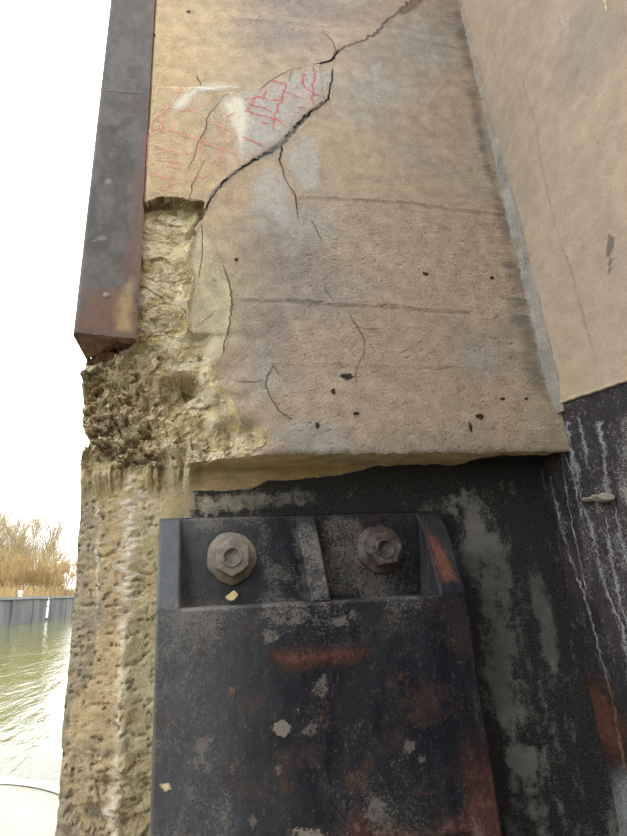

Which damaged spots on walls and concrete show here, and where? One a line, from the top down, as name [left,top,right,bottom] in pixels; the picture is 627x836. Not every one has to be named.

crack [188,0,412,281]
spalling [86,196,268,468]
crack [196,266,233,352]
rust [426,529,456,581]
rust [588,680,626,769]